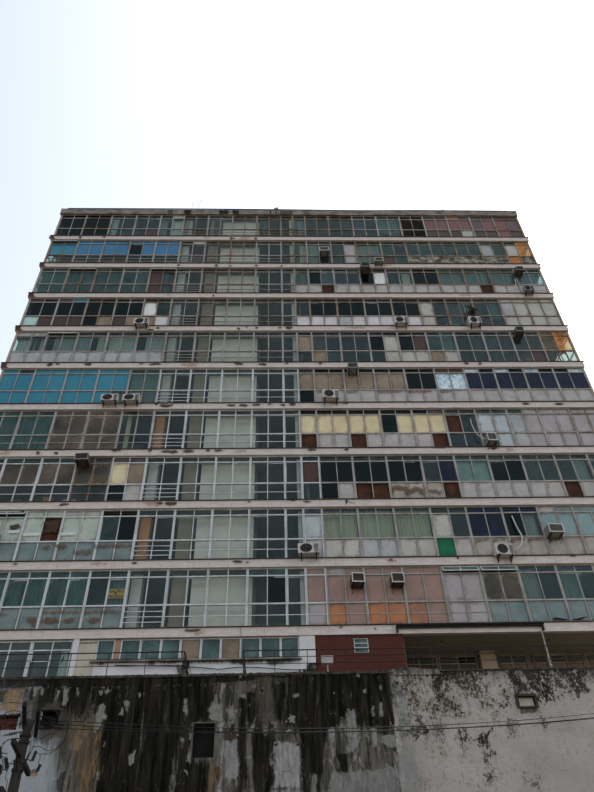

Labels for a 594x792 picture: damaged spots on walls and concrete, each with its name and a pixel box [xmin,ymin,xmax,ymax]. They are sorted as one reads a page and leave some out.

rust [392,485,441,496]
rust [23,610,119,626]
peeling [0,686,44,715]
peeling [54,687,79,706]
damp [400,669,593,713]
damp [0,658,395,792]
peeling [207,694,239,740]
damp [408,714,429,741]
damp [454,727,502,786]